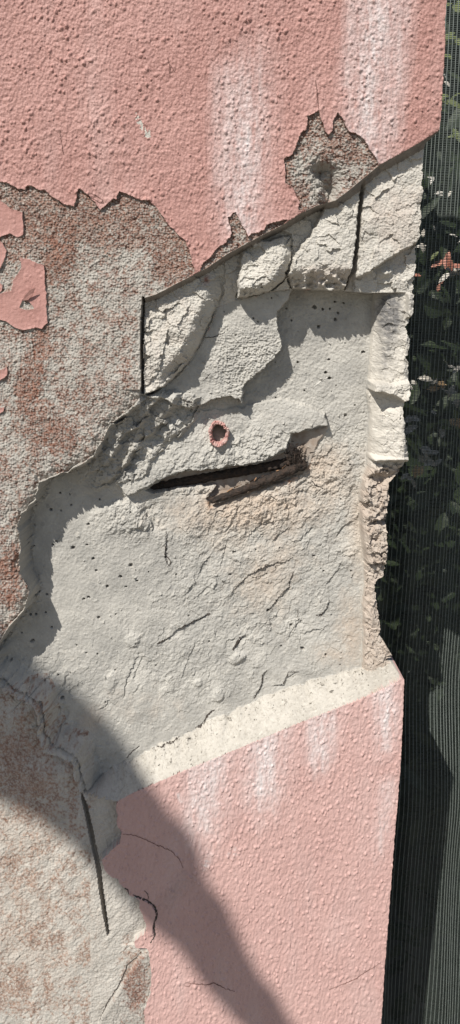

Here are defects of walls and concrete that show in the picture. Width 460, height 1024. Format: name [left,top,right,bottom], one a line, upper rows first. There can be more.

spalling [0,111,424,801]
corrosion [139,438,361,607]